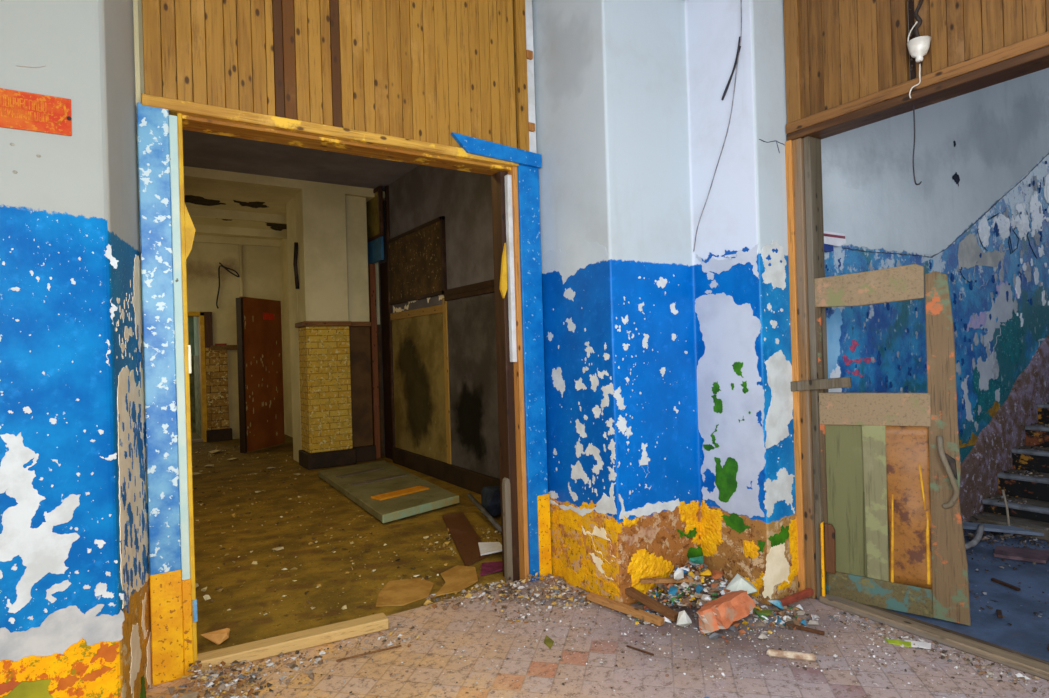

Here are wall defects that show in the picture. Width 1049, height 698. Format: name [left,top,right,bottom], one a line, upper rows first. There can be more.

peeling [58,244,118,269]
flaking render [184,195,268,221]
flaking render [265,222,287,231]
peeling [948,161,1049,448]
peeling [826,307,864,392]
peeling [541,240,799,600]
peeling [0,254,152,698]